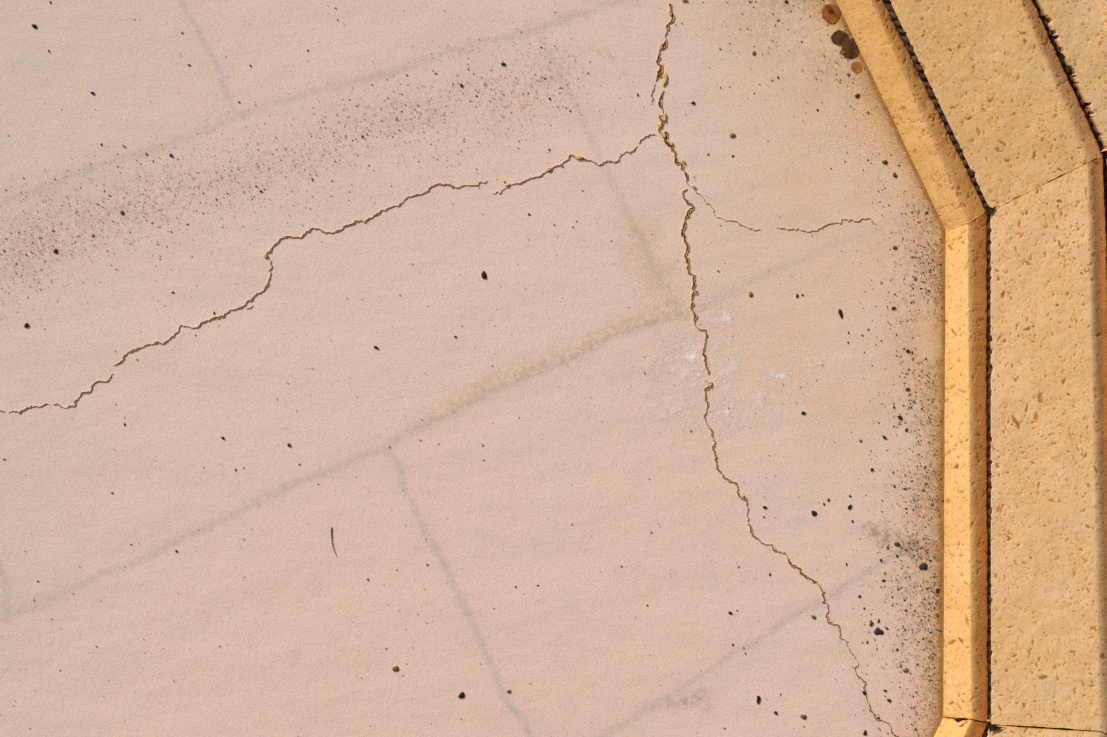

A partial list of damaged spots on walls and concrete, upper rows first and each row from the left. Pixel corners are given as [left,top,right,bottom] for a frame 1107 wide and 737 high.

crack [0,378,110,414]
crack [116,0,897,737]
corrosion [822,0,946,737]
water stain [850,134,944,737]